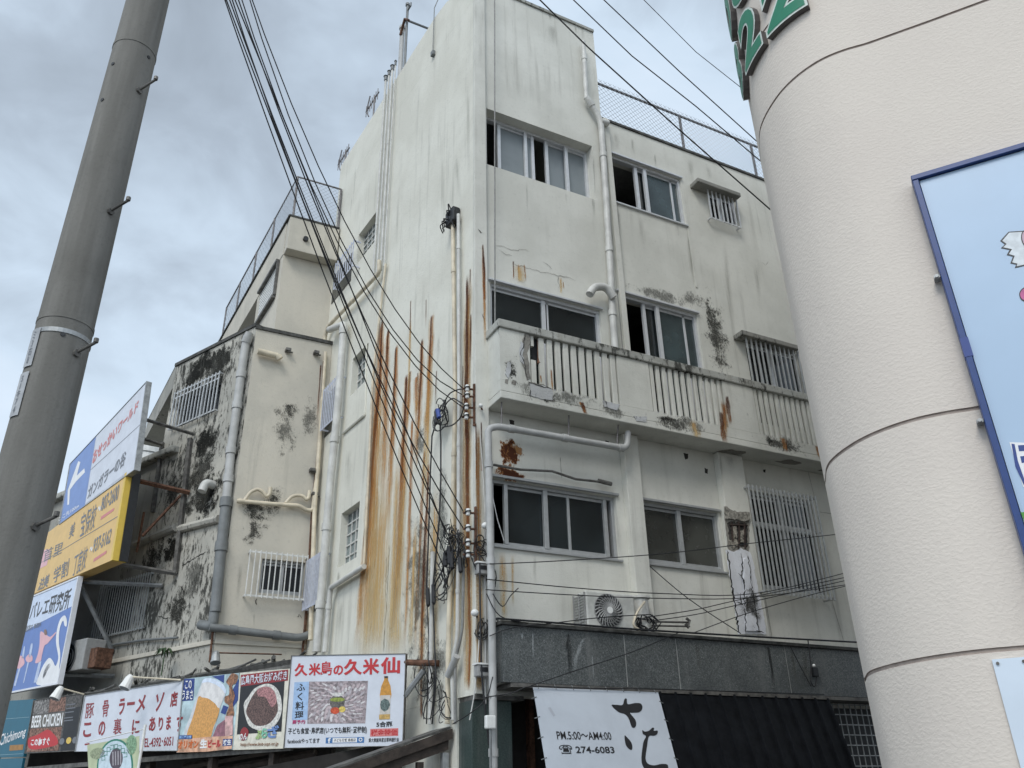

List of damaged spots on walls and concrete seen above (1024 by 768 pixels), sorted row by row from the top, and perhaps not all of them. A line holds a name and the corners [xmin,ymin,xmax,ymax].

damp [639,288,729,368]
damp [178,340,234,416]
peeling [505,334,553,400]
corrosion [720,397,731,439]
damp [164,426,222,520]
damp [242,488,282,544]
corrosion [357,302,438,715]
corrosion [454,245,486,687]
corrosion [496,439,524,482]
damp [163,558,202,626]
spalling [724,506,750,631]
crack [738,556,764,633]